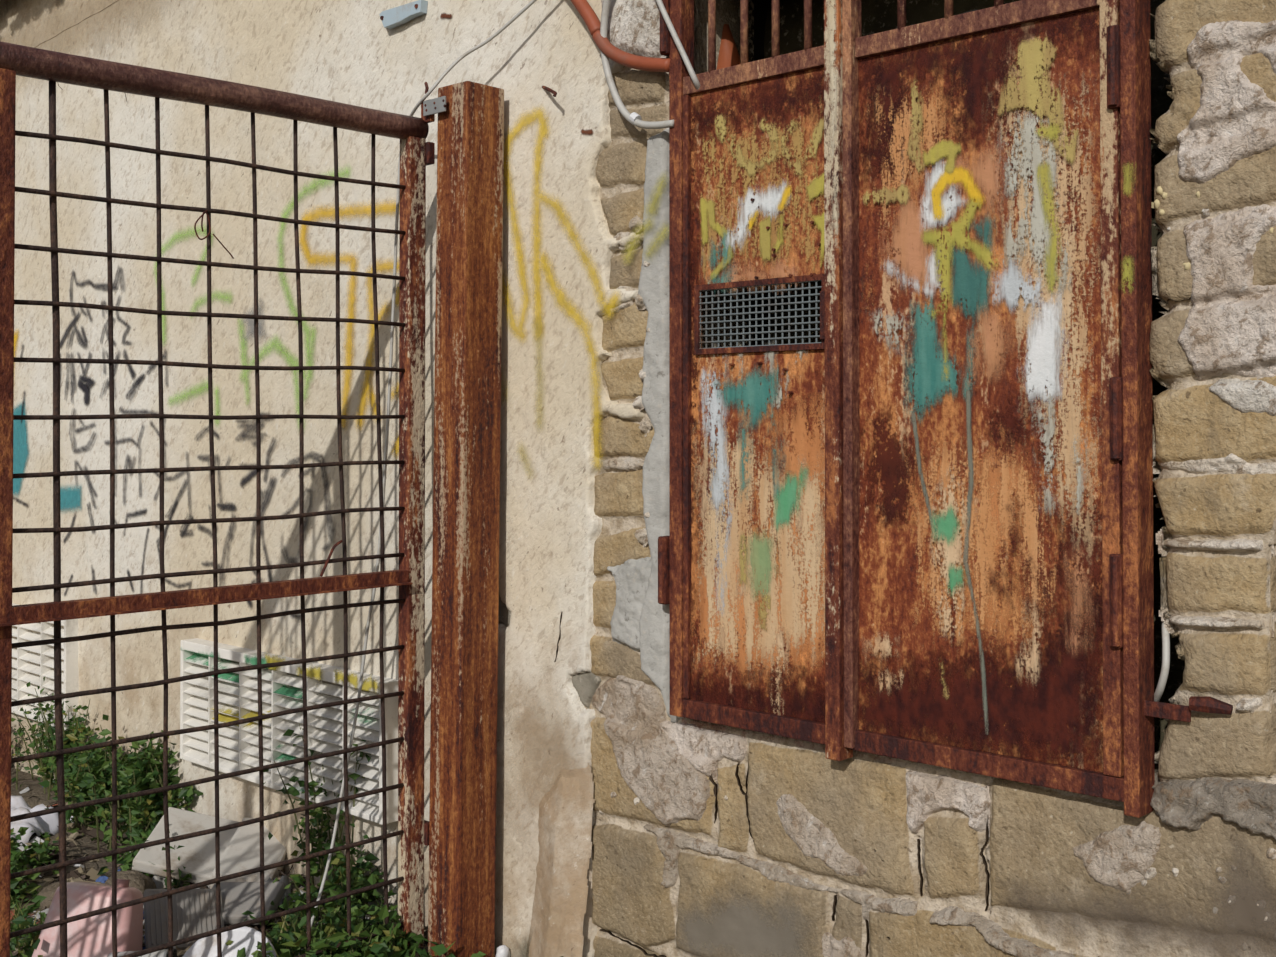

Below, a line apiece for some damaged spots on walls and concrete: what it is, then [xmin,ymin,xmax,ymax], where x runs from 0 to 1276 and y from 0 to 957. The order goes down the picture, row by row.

corrosion [690,70,824,533]
corrosion [858,8,1100,181]
peeling [1151,20,1276,416]
corrosion [690,400,825,723]
corrosion [858,402,1103,773]
crack [709,763,754,842]
crack [916,839,924,896]
crack [980,820,990,911]